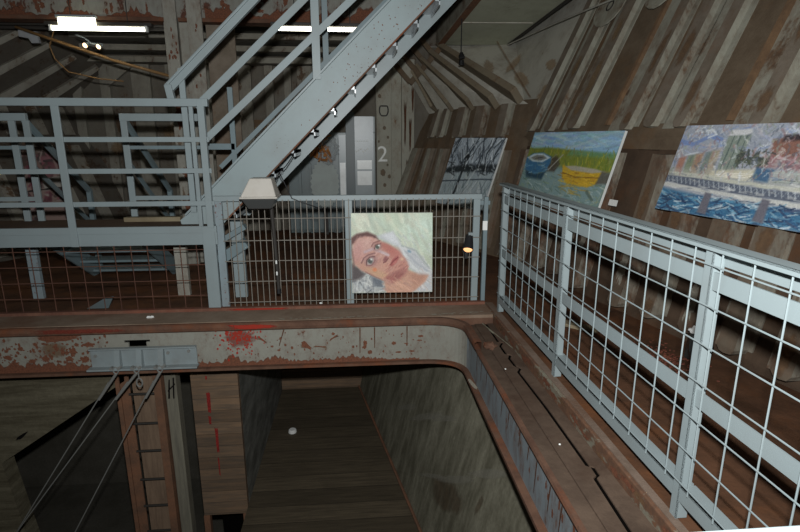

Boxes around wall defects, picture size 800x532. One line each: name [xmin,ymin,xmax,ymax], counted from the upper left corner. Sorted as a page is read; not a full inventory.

peeling [0,0,157,17]
peeling [204,0,236,18]
peeling [243,0,373,21]
spalling [179,372,201,479]